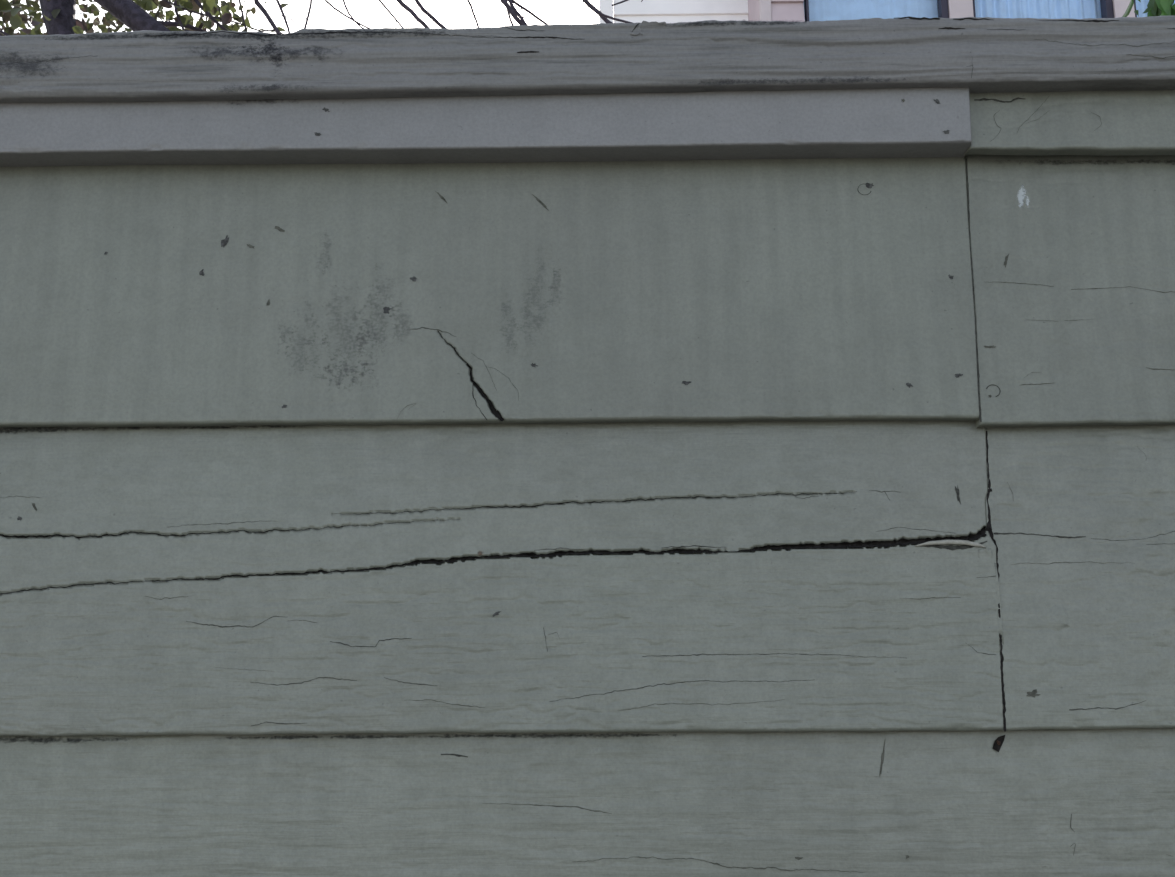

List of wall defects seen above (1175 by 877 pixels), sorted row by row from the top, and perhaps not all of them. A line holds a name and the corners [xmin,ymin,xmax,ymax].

crack [0,158,1175,732]